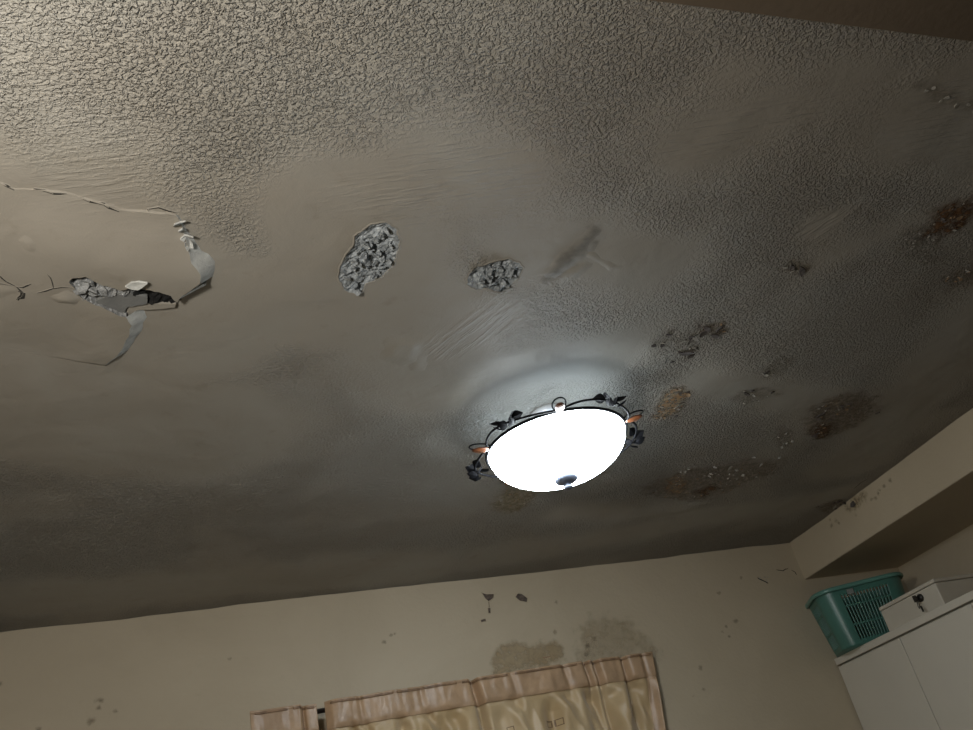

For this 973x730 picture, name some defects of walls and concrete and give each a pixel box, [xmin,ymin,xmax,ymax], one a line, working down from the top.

crack [2,182,119,212]
crack [146,205,178,213]
crack [0,275,72,301]
spalling [72,277,182,317]
spalling [336,221,402,296]
spalling [465,258,525,294]
peeling [651,323,726,365]